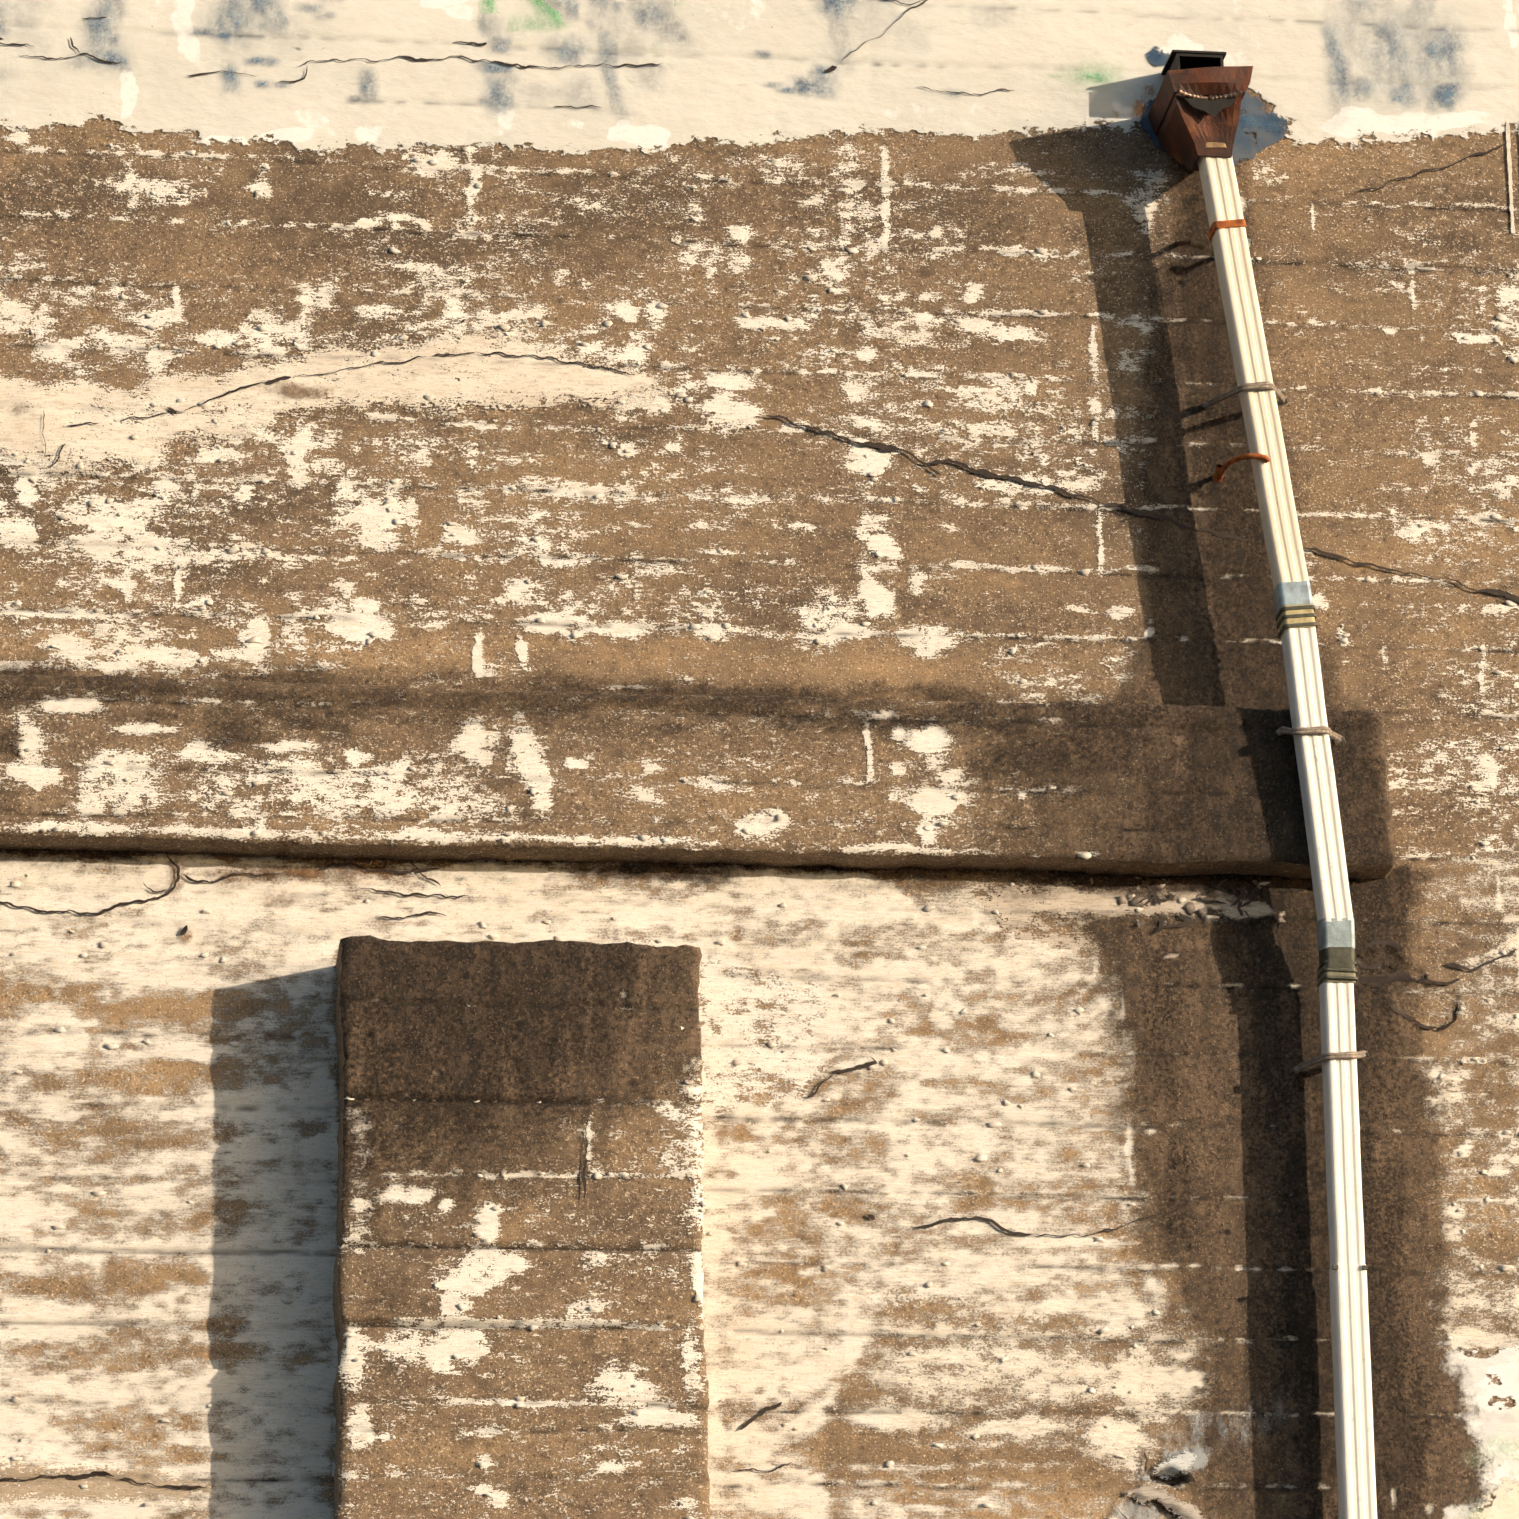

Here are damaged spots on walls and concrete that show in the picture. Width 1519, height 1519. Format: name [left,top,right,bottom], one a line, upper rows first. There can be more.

crack [824,0,927,73]
crack [924,87,1014,95]
crack [766,415,1255,541]
crack [1303,547,1519,603]
leakage [0,164,1339,1519]
crack [0,852,467,935]
leakage [1320,643,1488,1519]